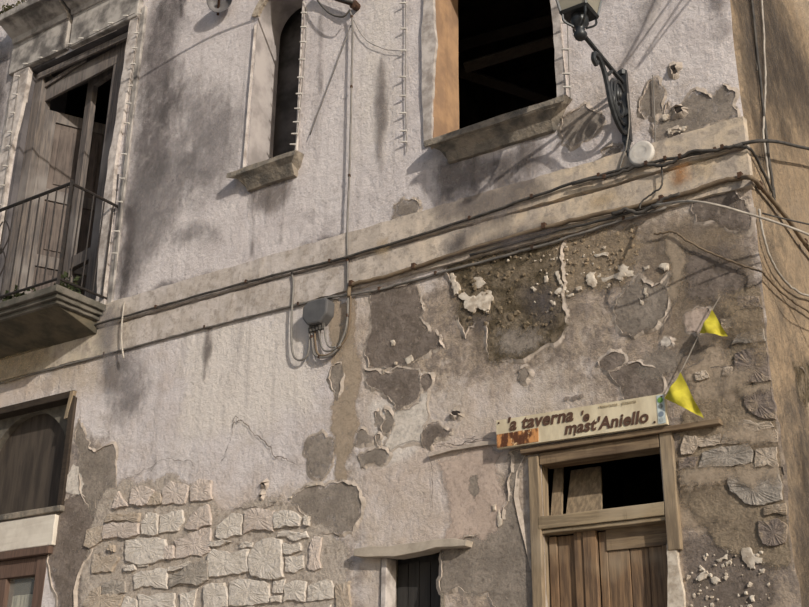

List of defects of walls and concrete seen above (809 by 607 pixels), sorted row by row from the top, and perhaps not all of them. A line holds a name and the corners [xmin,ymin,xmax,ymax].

peeling [557,101,607,152]
peeling [599,143,623,158]
peeling [636,61,741,142]
flaking render [46,278,465,607]
crack [222,416,295,464]
flaking render [436,223,792,607]
spalling [793,363,809,416]